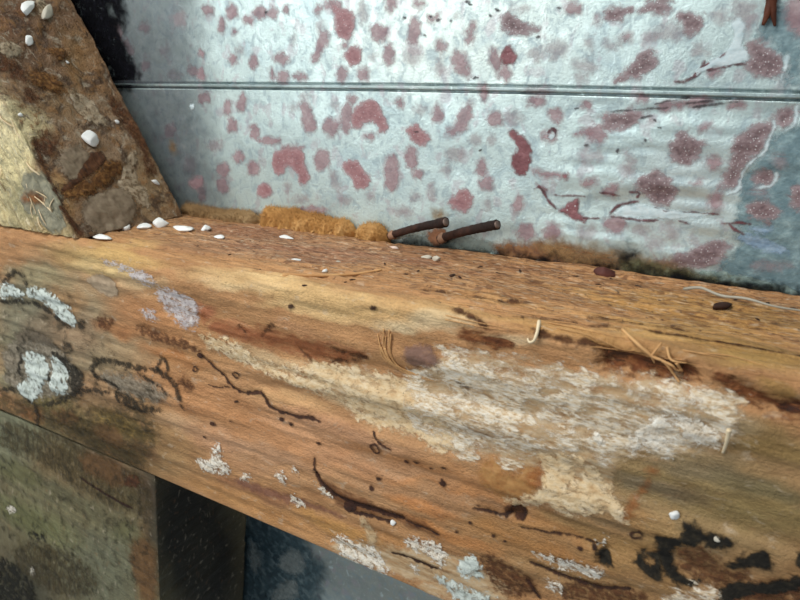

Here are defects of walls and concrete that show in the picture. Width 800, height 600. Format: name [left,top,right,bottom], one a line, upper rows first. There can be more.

damp [0,269,85,329]
rust [495,241,674,270]
damp [620,252,740,286]
damp [0,330,193,427]
damp [633,519,800,600]